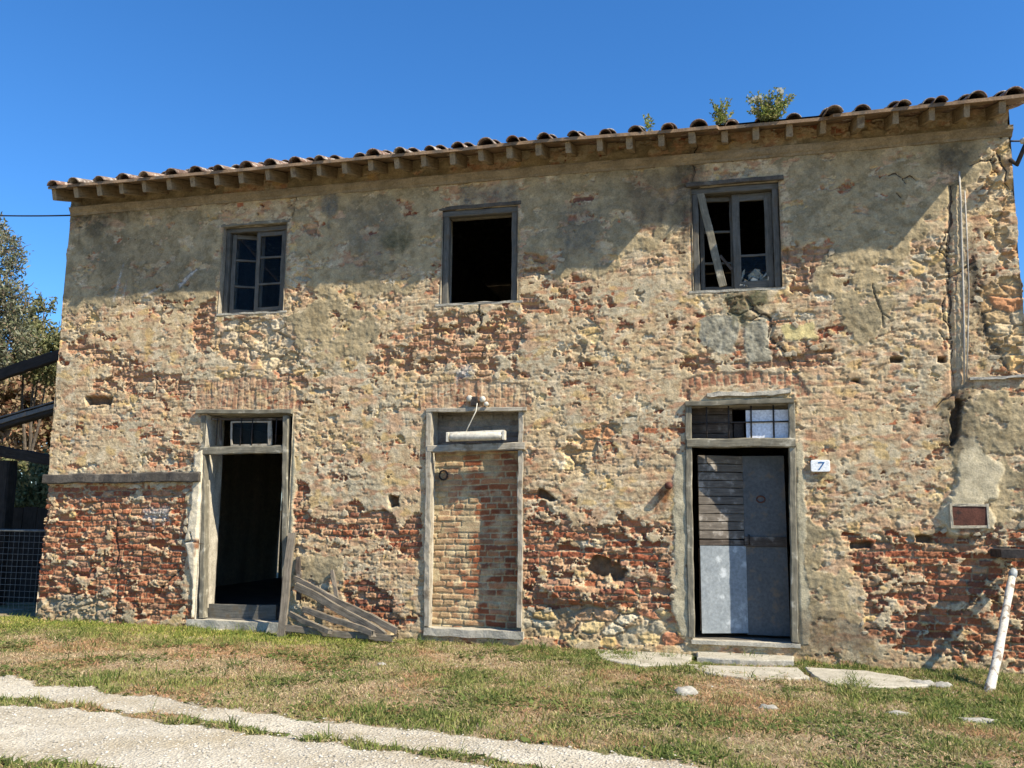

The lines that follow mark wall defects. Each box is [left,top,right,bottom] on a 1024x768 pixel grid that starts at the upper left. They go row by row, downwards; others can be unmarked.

spalling [363,293,547,382]
spalling [676,314,838,376]
crack [936,186,970,408]
spalling [973,166,1024,374]
spalling [37,447,197,625]
spalling [293,477,425,561]
spalling [339,579,417,627]
spalling [522,487,686,648]
spalling [836,521,1024,673]